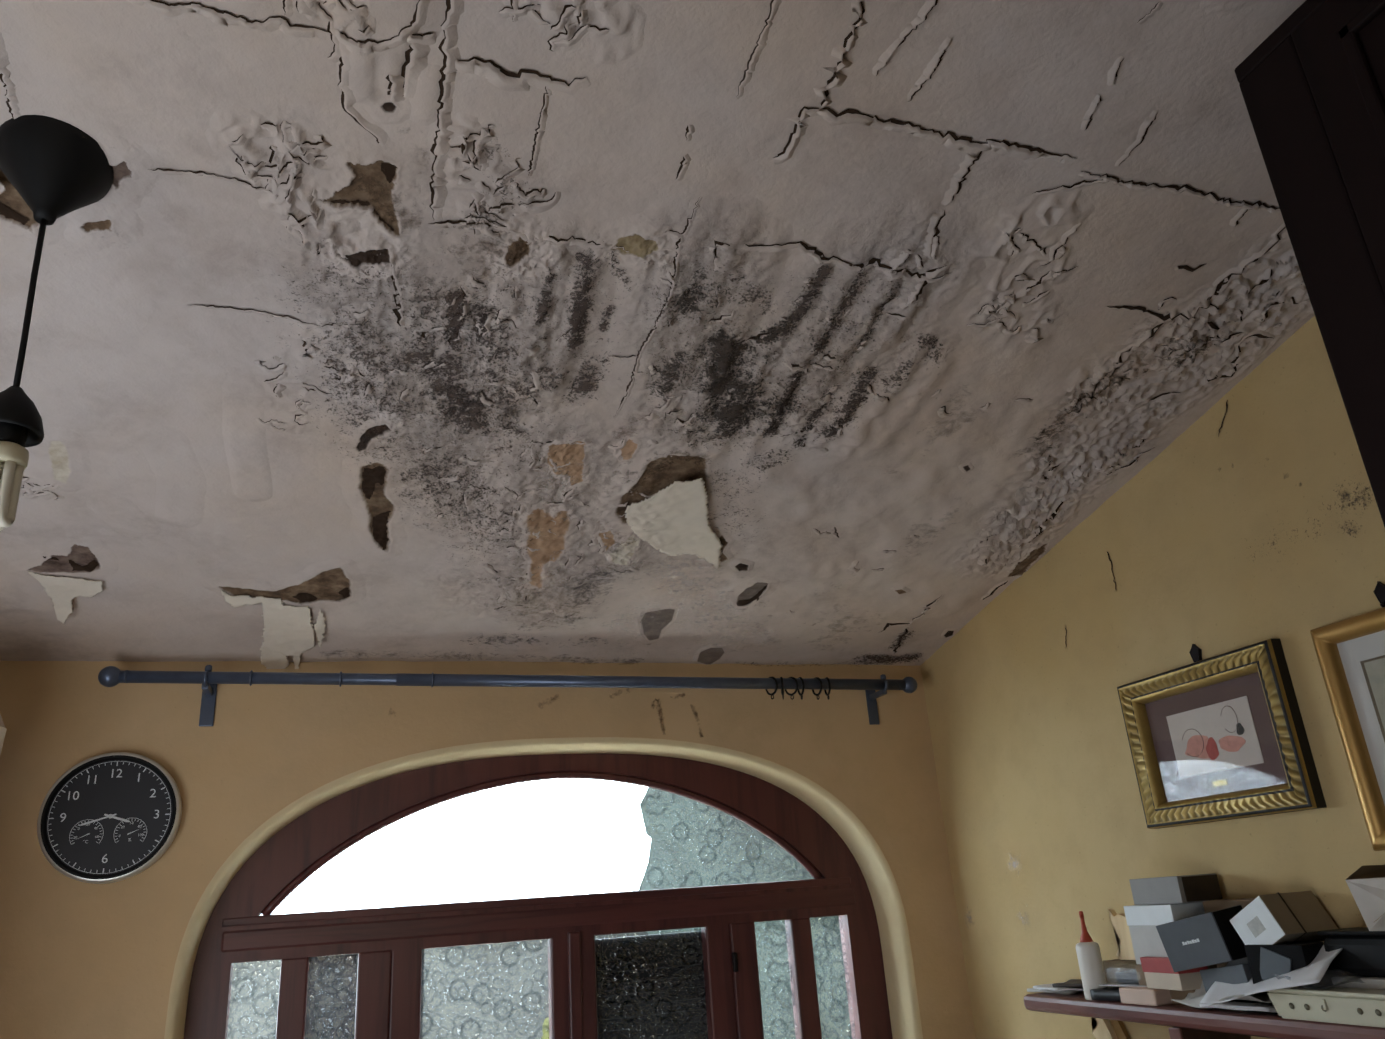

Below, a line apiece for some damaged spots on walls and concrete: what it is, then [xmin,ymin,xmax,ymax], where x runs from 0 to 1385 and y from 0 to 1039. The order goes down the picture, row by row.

crack [0,32,21,119]
spalling [0,135,160,252]
crack [187,262,495,344]
spalling [288,137,432,286]
crack [127,0,629,252]
crack [530,125,703,445]
crack [736,0,1299,476]
leakage [278,242,629,561]
leakage [646,260,943,537]
spalling [336,408,413,550]
spalling [516,435,736,589]
peeling [201,558,367,669]